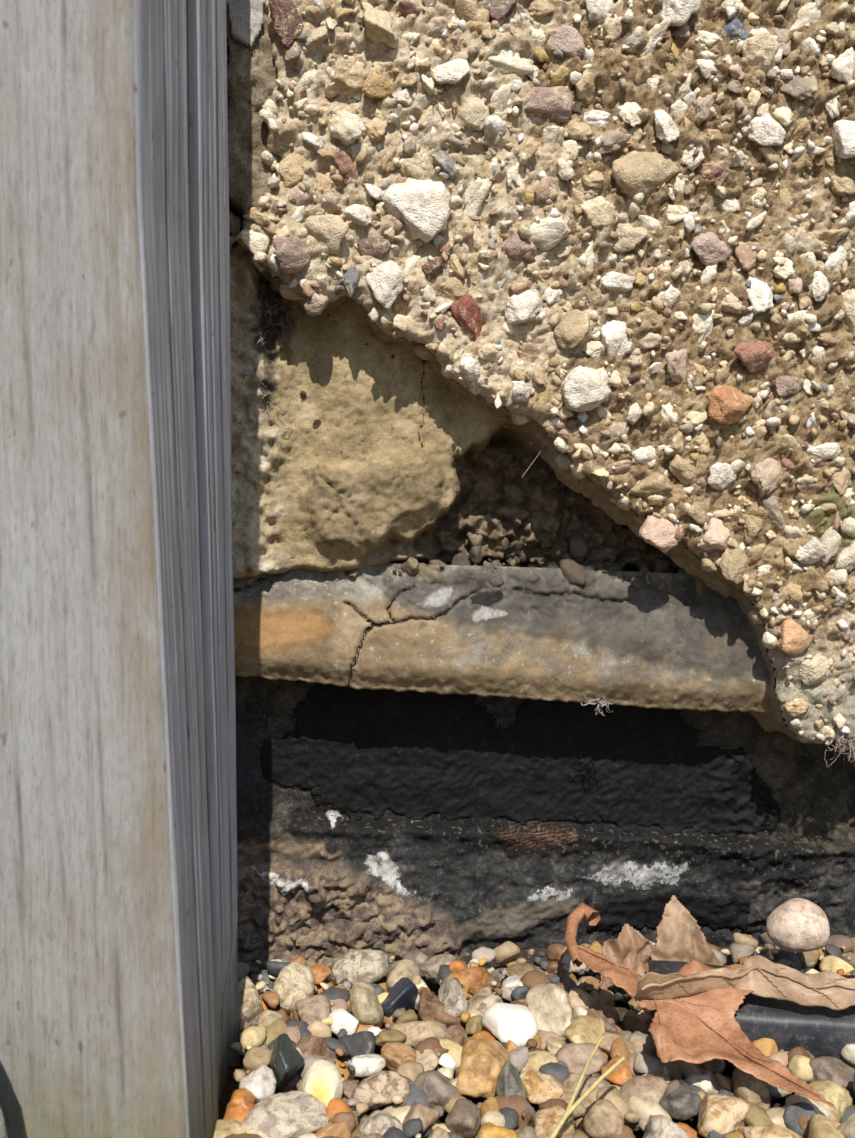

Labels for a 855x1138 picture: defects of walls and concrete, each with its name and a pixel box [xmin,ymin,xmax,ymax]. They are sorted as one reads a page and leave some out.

crack [224,39,232,109]
spalling [259,99,279,124]
spalling [261,151,275,166]
spalling [229,211,800,742]
crack [344,585,481,687]
damp [236,722,259,796]
efflorescence [327,810,340,828]
efflorescence [251,865,309,894]
efflorescence [364,852,416,895]
damp [585,860,688,890]
damp [457,886,579,938]